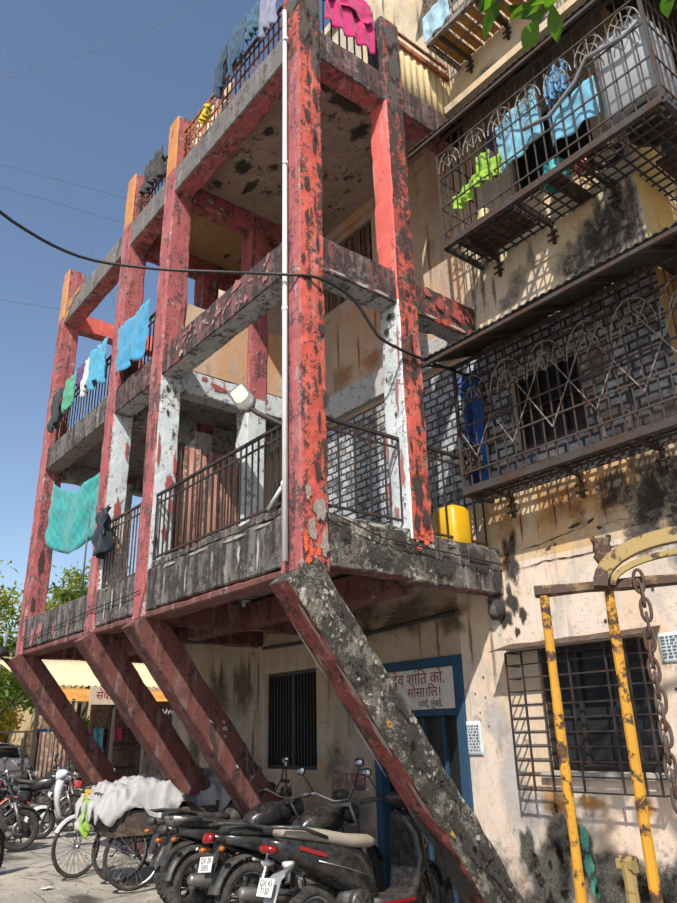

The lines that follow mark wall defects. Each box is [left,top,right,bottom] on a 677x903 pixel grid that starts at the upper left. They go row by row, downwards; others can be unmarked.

mould [235,160,258,195]
peeling [304,29,321,224]
mould [320,82,362,115]
mould [350,125,369,141]
leakage [559,182,644,277]
peeling [164,449,177,515]
spalling [304,344,330,563]
leakage [595,452,677,541]
peeling [333,659,393,756]